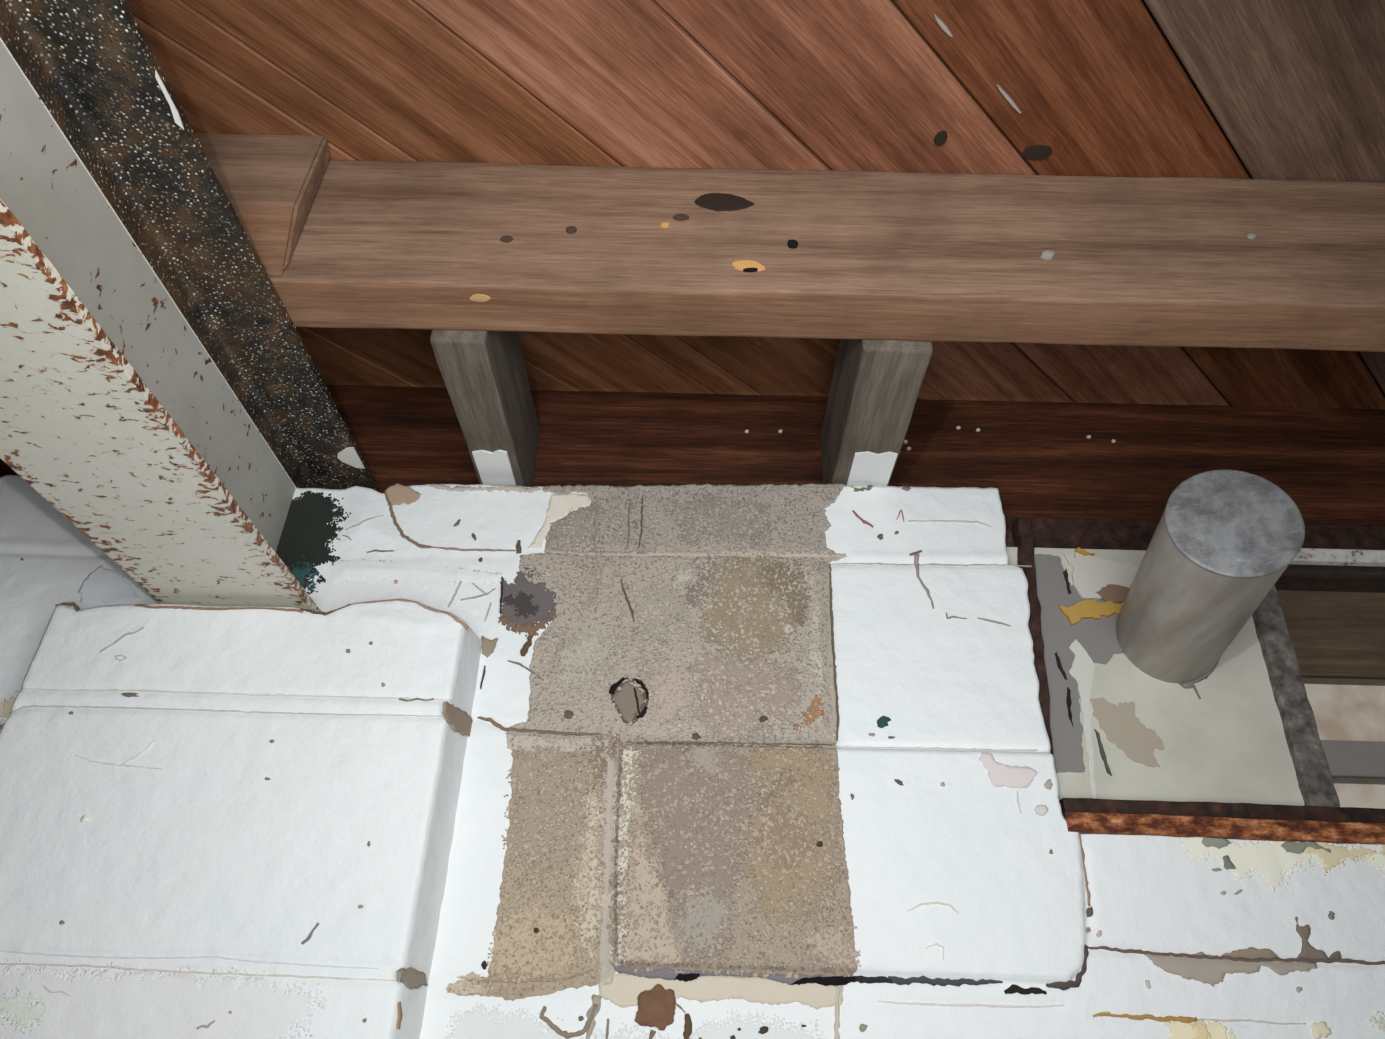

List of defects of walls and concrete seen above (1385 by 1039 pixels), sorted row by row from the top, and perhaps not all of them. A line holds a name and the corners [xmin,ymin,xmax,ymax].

peeling [385,483,873,1009]
leakage [445,494,861,1039]
peeling [1201,837,1236,872]
peeling [1281,841,1331,854]
peeling [1144,916,1342,993]